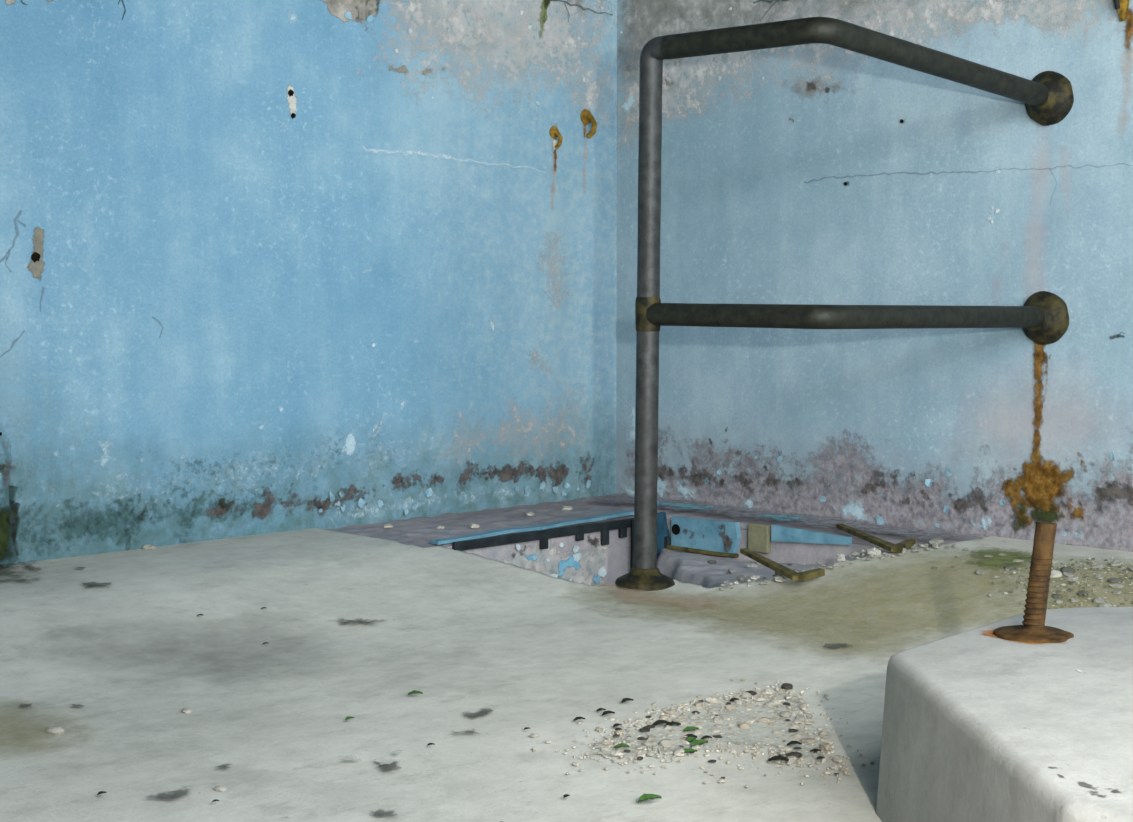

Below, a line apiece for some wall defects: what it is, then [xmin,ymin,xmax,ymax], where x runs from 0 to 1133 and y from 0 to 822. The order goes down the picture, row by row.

peeling [321,0,610,110]
peeling [618,0,1118,143]
rust [1125,8,1133,49]
peeling [207,485,383,519]
peeling [383,473,444,515]
peeling [454,393,635,504]
peeling [657,430,1133,589]
rust [1002,342,1086,529]